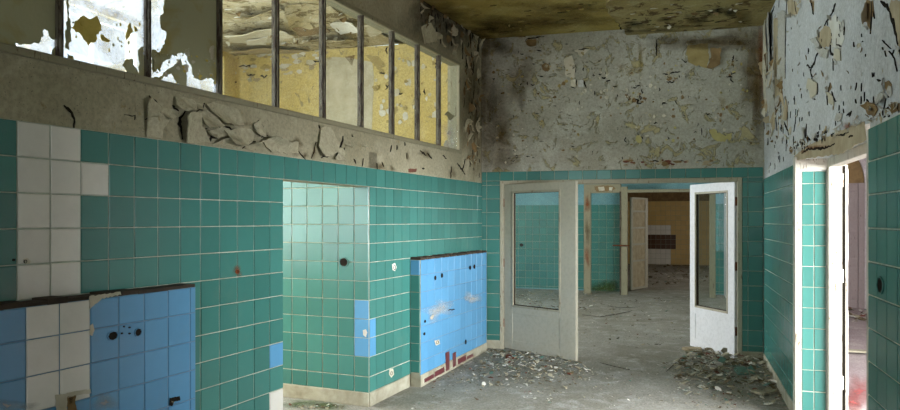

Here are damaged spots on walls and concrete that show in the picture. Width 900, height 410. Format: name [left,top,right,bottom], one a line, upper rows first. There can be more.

crack [63,105,75,128]
peeling [0,0,485,178]
peeling [492,2,753,166]
leakage [745,44,763,116]
flaking render [758,0,900,170]